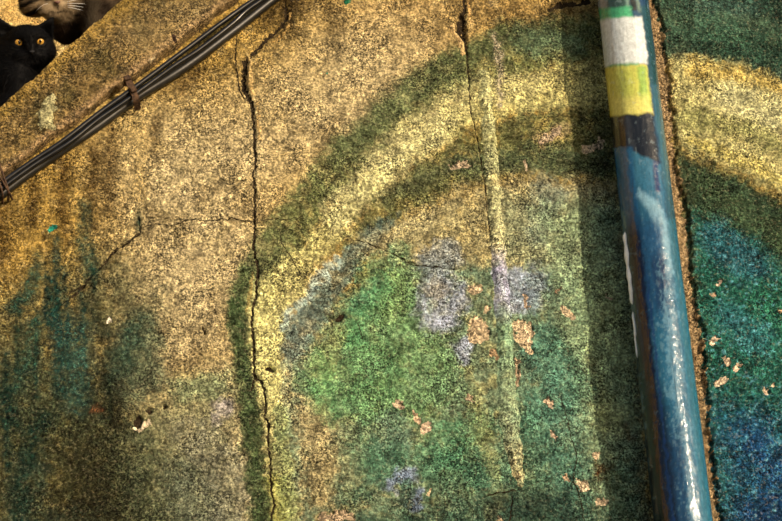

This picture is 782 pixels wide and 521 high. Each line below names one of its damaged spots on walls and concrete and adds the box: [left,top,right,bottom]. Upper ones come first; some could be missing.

crack [449,0,491,235]
crack [39,5,304,521]
spalling [467,305,499,361]